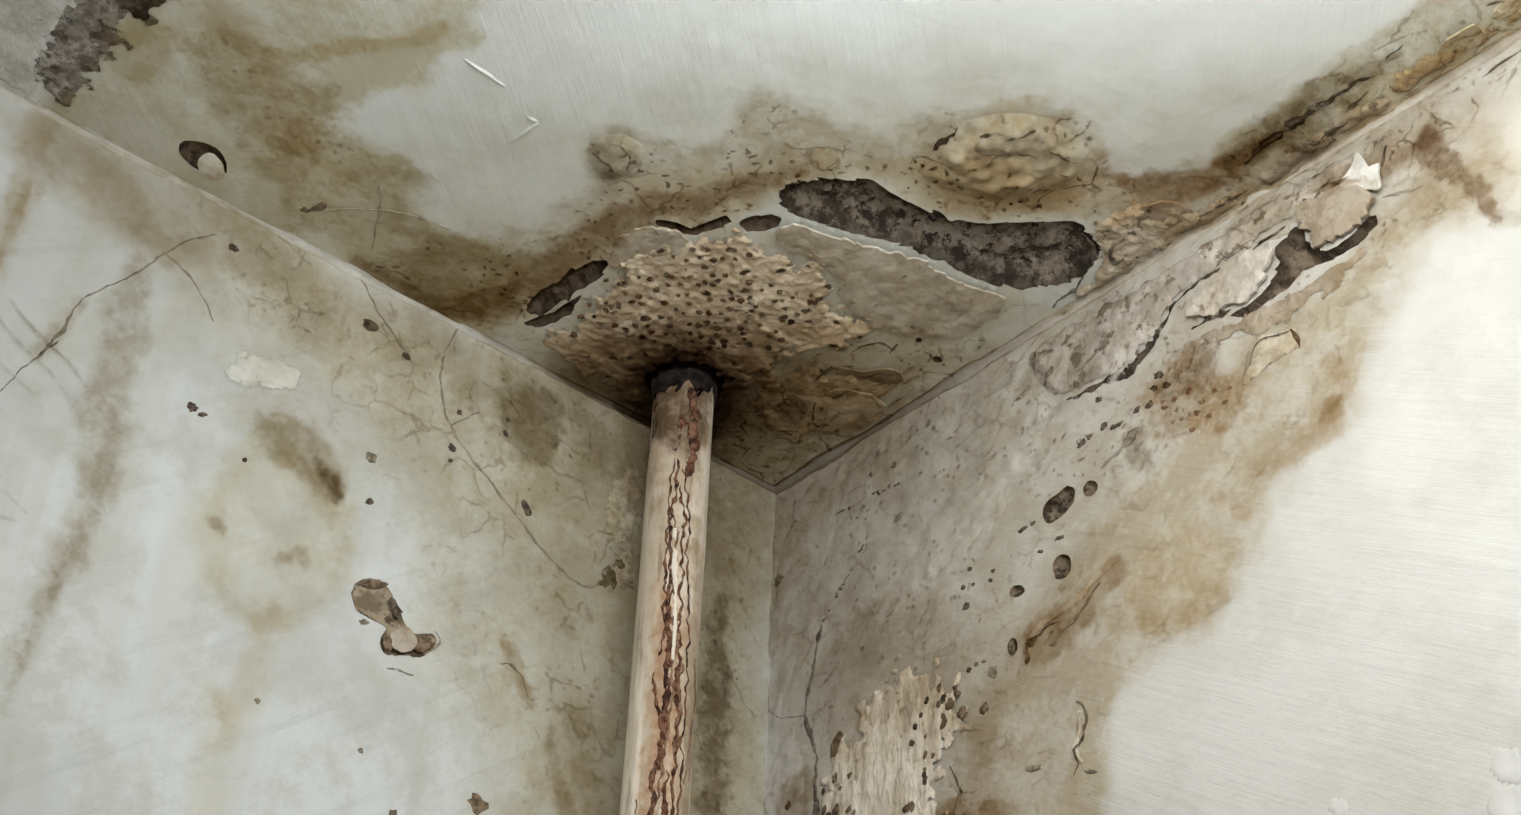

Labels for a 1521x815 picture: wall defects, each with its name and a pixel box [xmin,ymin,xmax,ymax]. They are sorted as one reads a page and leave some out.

peeling [0,0,181,107]
spalling [179,140,227,180]
water stain [624,346,861,485]
peeling [351,578,441,676]
crack [768,535,868,815]